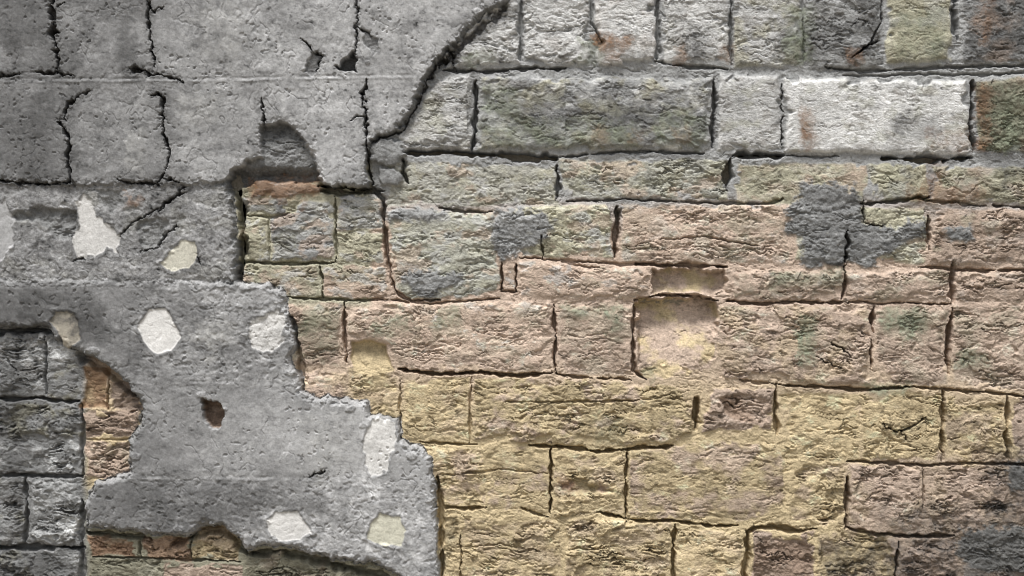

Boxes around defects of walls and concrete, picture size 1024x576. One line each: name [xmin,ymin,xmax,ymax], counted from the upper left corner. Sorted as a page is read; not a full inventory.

crack [131,1,184,152]
spalling [301,52,323,76]
spalling [336,30,379,79]
spalling [363,0,510,165]
peeling [0,189,127,261]
crack [118,176,186,252]
peeling [137,217,198,274]
spalling [194,123,439,533]
spalling [633,267,728,381]
spalling [0,306,406,576]
spalling [560,479,615,494]
spalling [753,539,814,576]